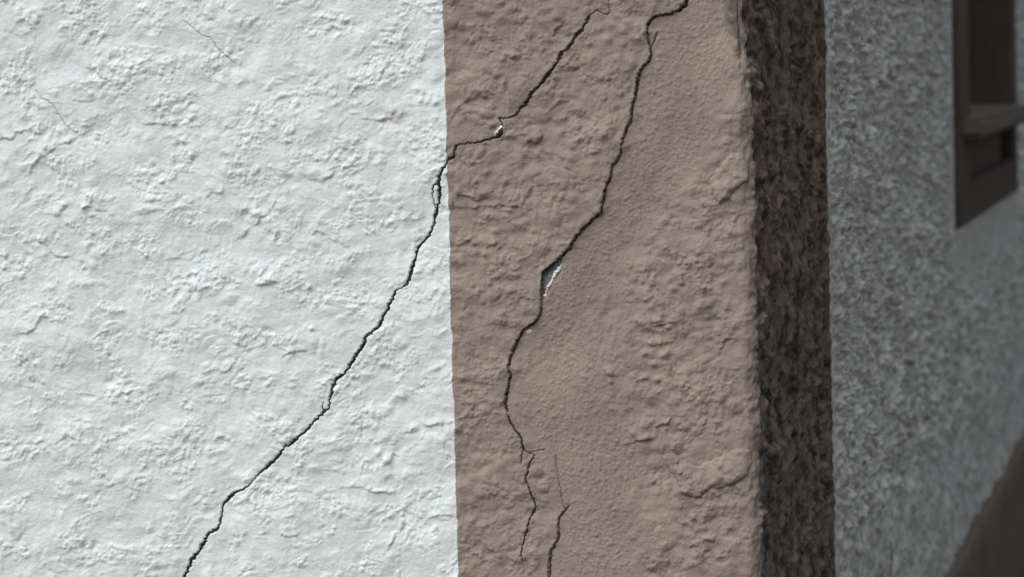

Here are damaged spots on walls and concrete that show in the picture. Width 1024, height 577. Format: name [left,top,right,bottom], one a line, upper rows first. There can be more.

crack [184,1,610,577]
spalling [542,259,562,298]
crack [504,0,688,577]